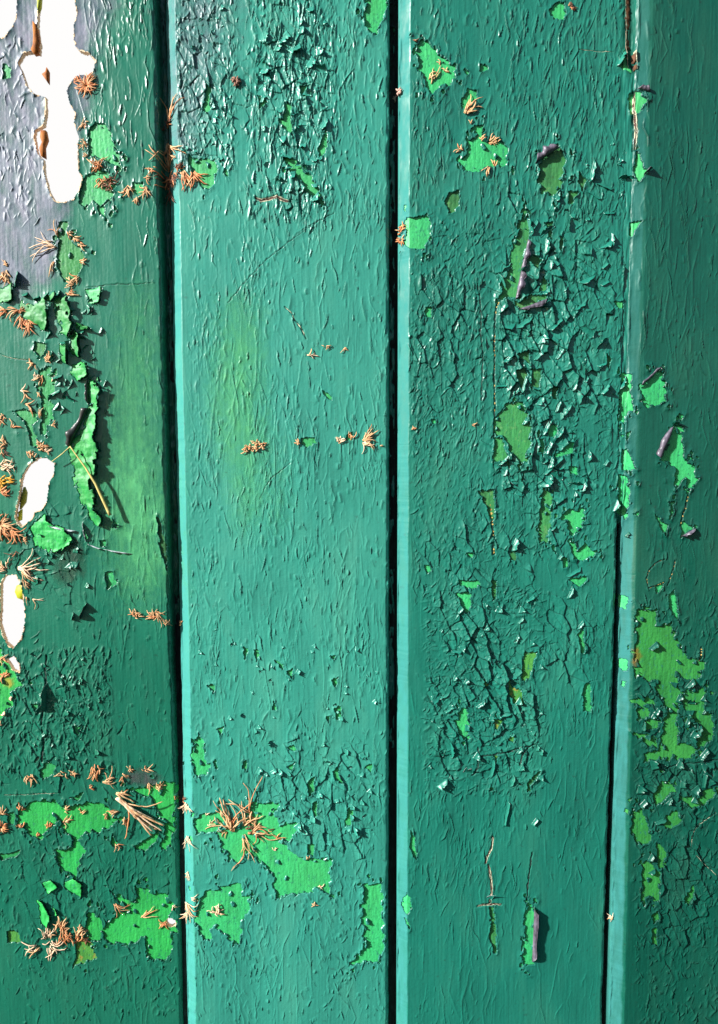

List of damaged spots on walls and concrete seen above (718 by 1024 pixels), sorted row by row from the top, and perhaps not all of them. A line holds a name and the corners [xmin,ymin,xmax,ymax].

peeling [412,36,488,109]
crack [256,194,290,202]
peeling [400,191,460,258]
peeling [0,222,131,589]
crack [479,296,499,428]
peeling [7,793,259,971]
peeling [121,775,179,851]
peeling [190,777,340,900]
peeling [347,874,388,974]
crack [475,745,532,772]
peeling [519,894,539,973]
peeling [618,584,718,945]